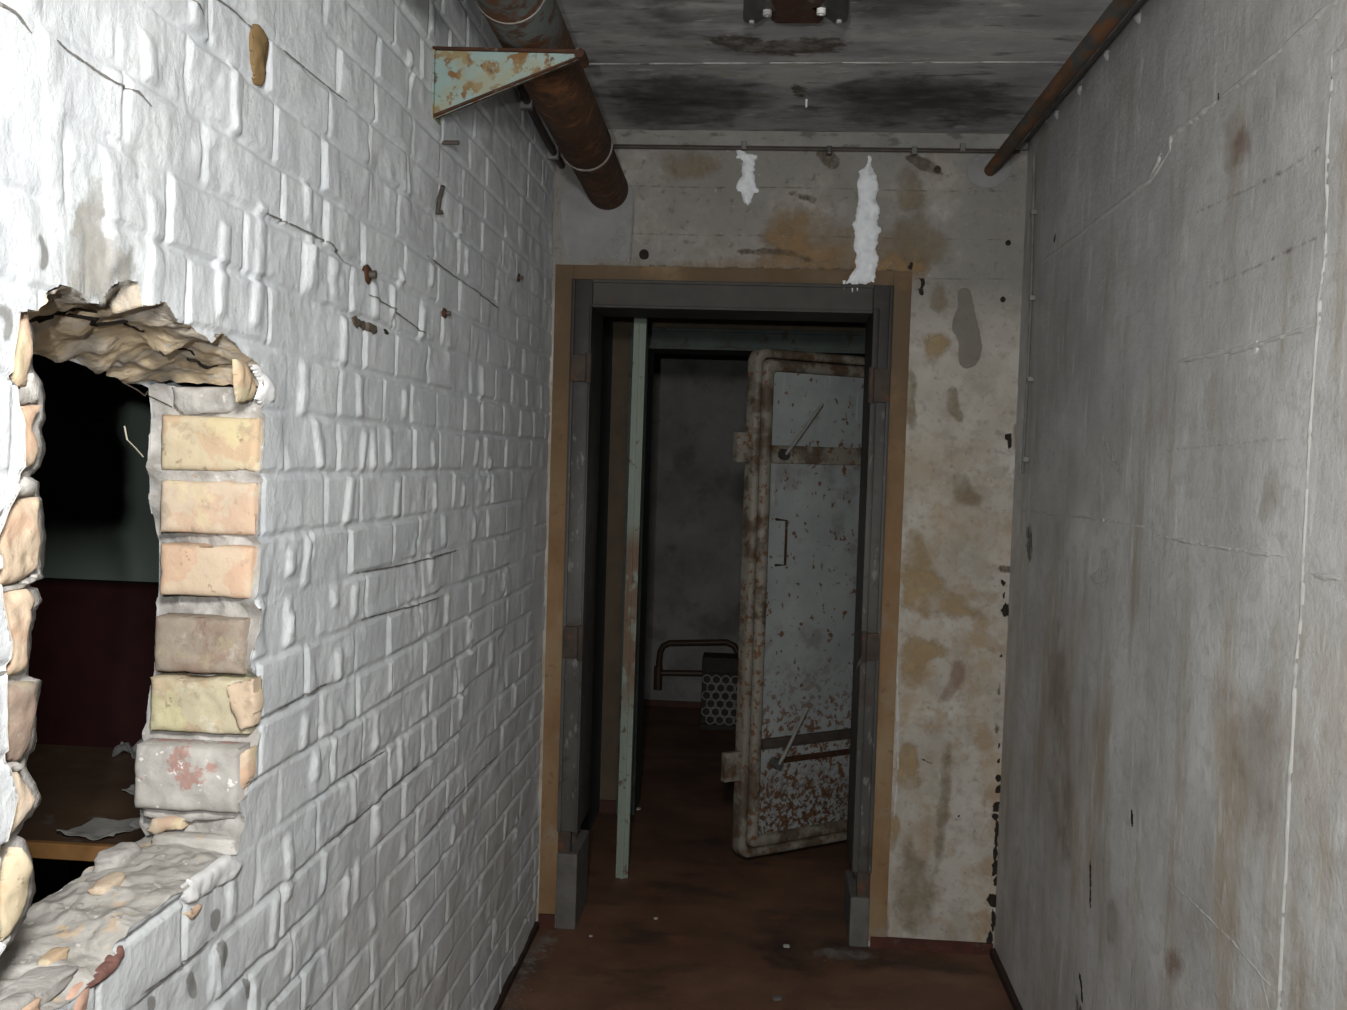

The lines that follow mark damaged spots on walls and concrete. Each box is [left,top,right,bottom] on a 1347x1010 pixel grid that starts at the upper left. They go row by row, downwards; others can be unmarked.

crack [0,2,152,106]
leakage [618,77,751,124]
leakage [837,79,998,125]
leakage [736,150,759,205]
leakage [843,155,891,292]
leakage [925,288,982,368]
spalling [0,195,276,1010]